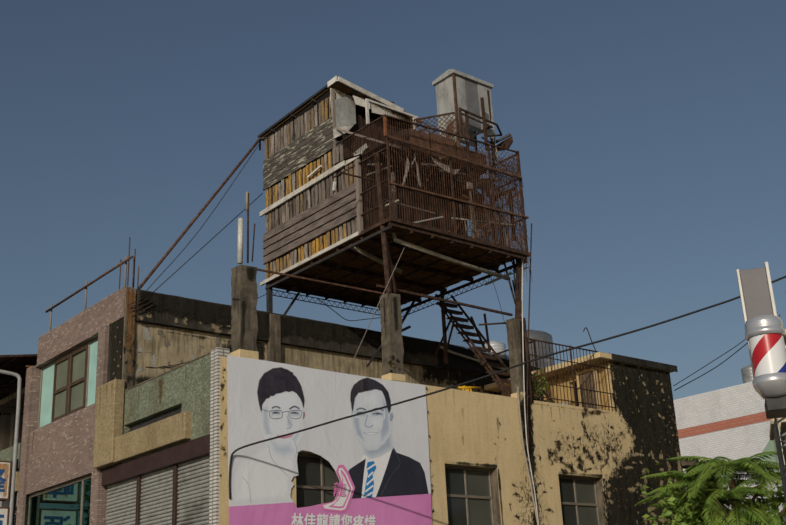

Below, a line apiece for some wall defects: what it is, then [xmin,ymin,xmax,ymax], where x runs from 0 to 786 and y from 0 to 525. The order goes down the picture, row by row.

leakage [110,290,245,381]
leakage [256,312,381,360]
leakage [136,377,163,403]
mould [599,362,685,525]